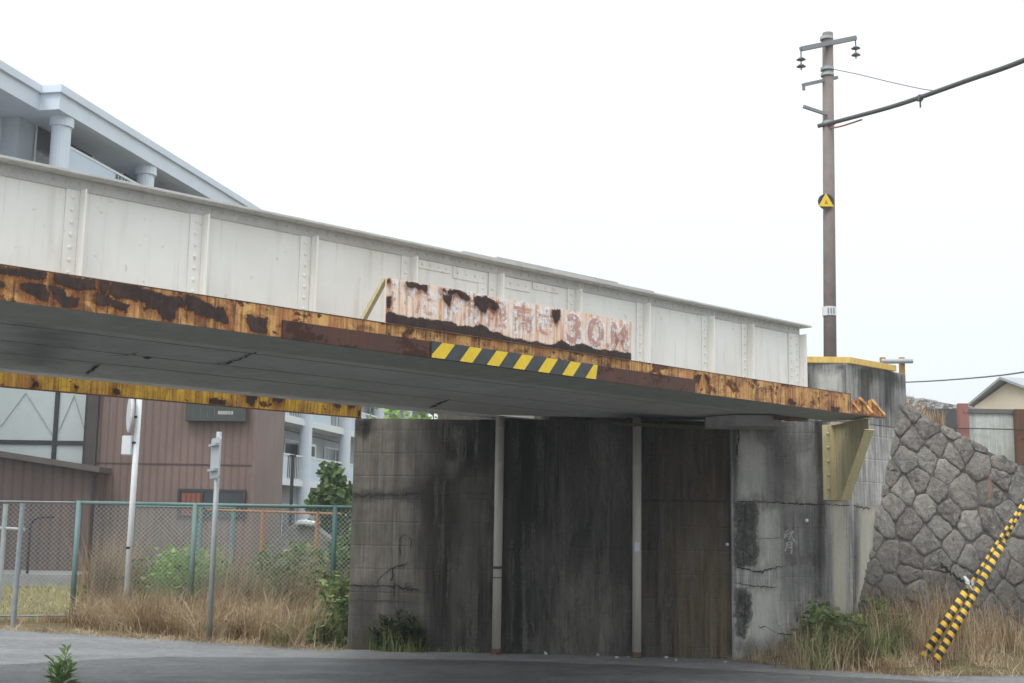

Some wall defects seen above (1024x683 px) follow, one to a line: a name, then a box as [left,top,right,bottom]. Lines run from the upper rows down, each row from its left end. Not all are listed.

corrosion [0,267,231,328]
corrosion [246,314,269,335]
corrosion [386,278,631,360]
leakage [356,419,370,436]
crack [348,536,412,594]
leakage [360,419,491,653]
leakage [501,420,875,660]
crack [734,565,783,588]